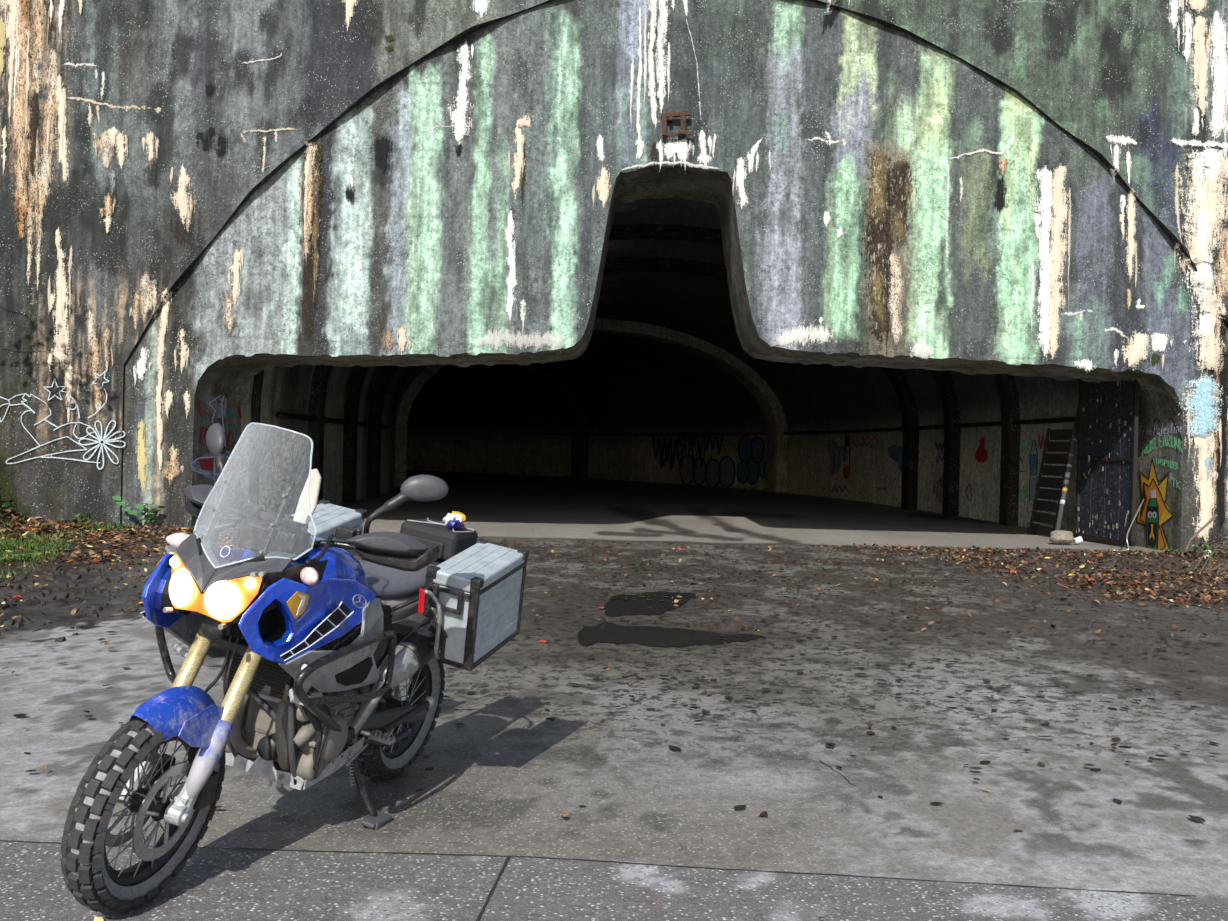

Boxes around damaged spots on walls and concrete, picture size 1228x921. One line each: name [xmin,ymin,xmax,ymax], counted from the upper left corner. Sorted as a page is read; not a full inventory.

damp [446,39,475,156]
damp [472,207,570,350]
rust [853,148,919,354]
damp [1030,163,1072,362]
peeling [1178,374,1223,439]